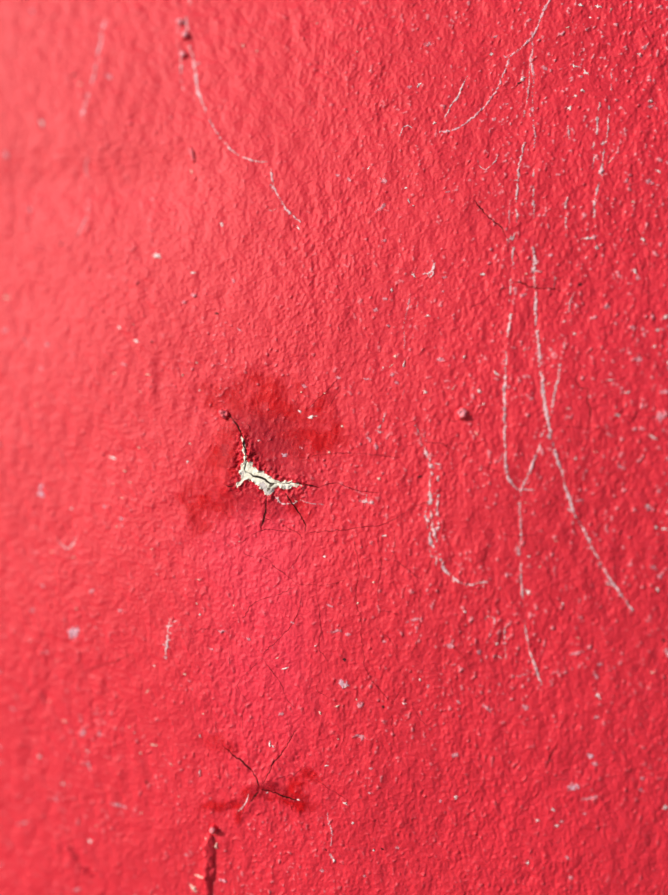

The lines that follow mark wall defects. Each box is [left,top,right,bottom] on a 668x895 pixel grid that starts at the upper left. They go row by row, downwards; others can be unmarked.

peeling [226,417,377,528]
crack [225,724,297,801]